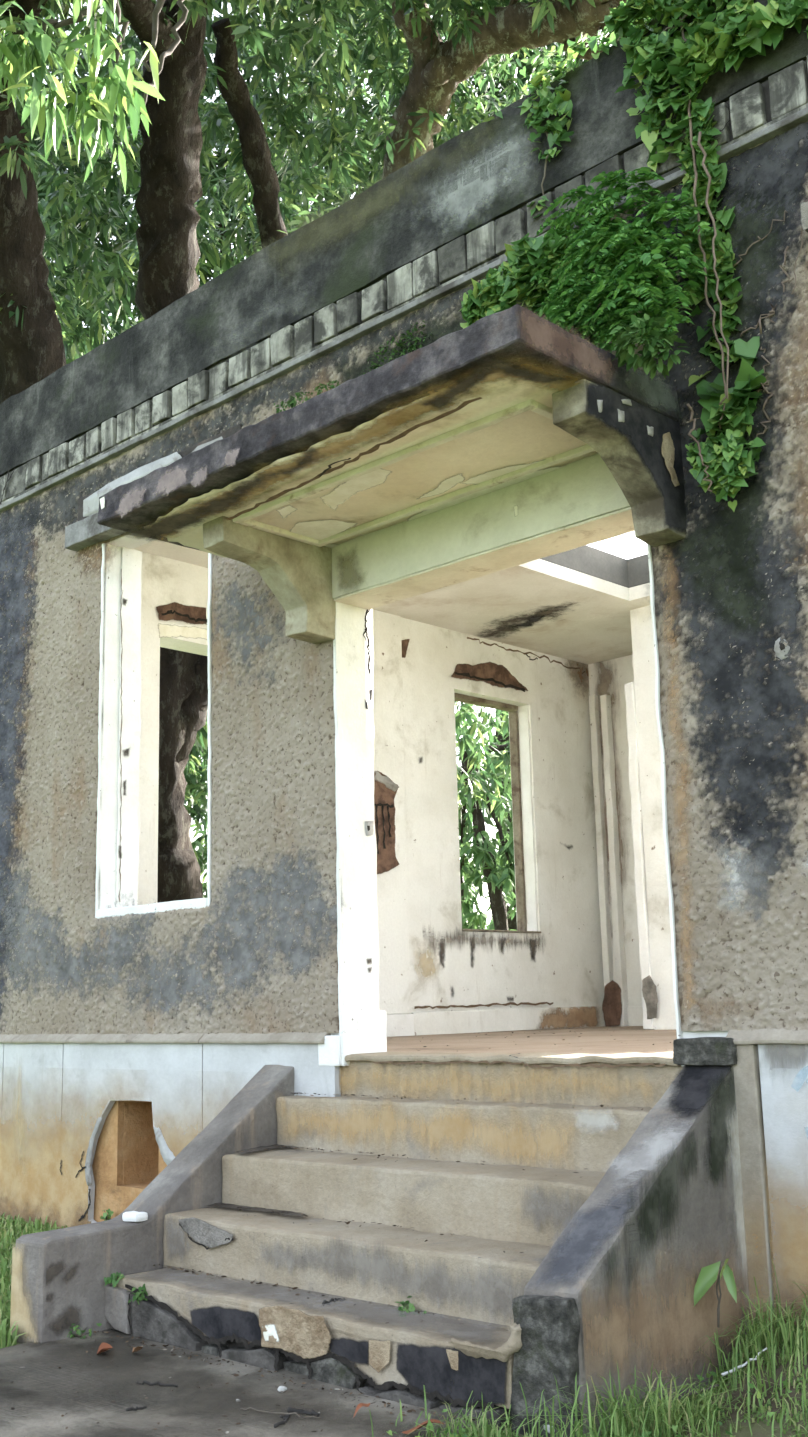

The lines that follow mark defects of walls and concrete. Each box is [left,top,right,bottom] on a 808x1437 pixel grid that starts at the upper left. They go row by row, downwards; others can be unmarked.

peeling [83,436,240,517]
water stain [521,122,808,918]
flaking render [156,602,207,640]
water stain [0,277,486,1016]
flaking render [451,662,528,692]
flaking render [365,771,399,874]
water stain [423,929,543,967]
water stain [766,1044,808,1068]
water stain [526,1065,807,1336]
flaking render [259,1305,331,1359]
water stain [145,1220,524,1405]
spalling [451,1322,522,1362]